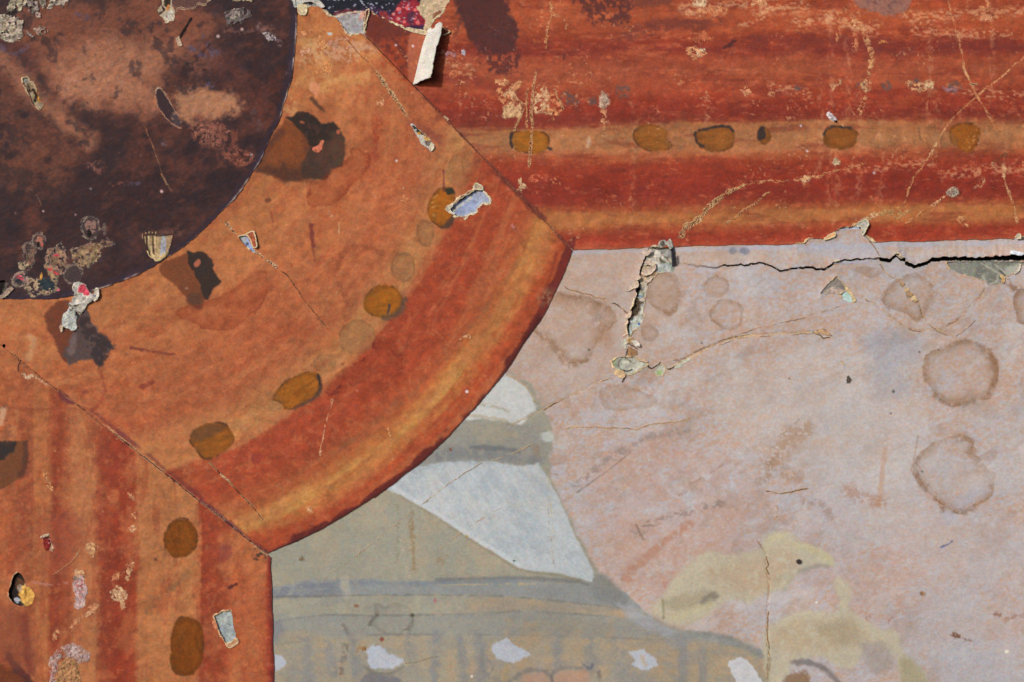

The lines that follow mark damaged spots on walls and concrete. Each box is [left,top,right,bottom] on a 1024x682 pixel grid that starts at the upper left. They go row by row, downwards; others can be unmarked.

peeling [292,0,465,85]
peeling [446,183,492,220]
peeling [59,282,100,332]
crack [715,234,1024,336]
peeling [611,356,674,383]